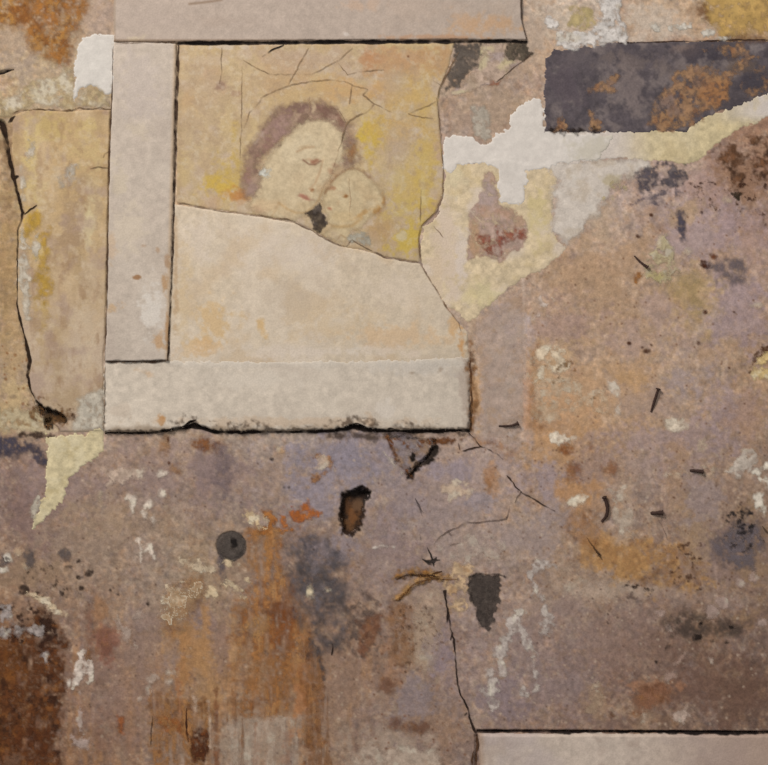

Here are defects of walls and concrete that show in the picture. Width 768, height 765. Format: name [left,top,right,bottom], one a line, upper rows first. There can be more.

rust [0,0,87,63]
peeling [0,109,111,530]
crack [0,51,113,409]
crack [103,37,533,451]
peeling [420,43,768,322]
rust [0,605,68,765]
rust [149,699,219,765]
rust [232,504,332,765]
spalling [338,485,371,537]
spalling [443,562,505,631]
crack [396,476,768,765]